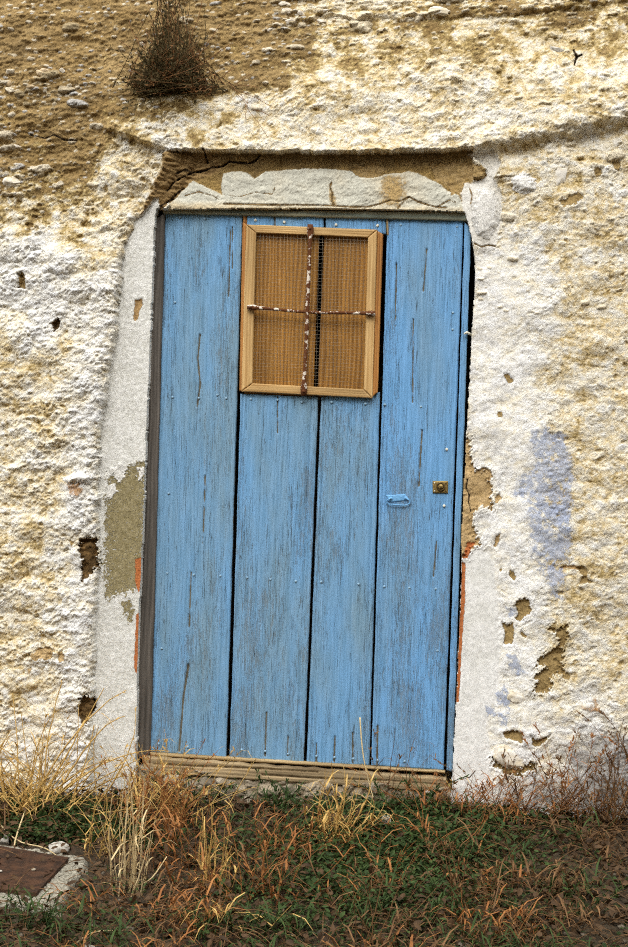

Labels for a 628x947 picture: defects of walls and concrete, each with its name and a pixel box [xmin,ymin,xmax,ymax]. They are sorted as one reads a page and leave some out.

peeling [70,460,146,673]
spalling [456,438,502,702]
spalling [502,598,532,644]
spalling [532,625,570,693]
spalling [489,757,535,776]
spalling [504,730,550,746]